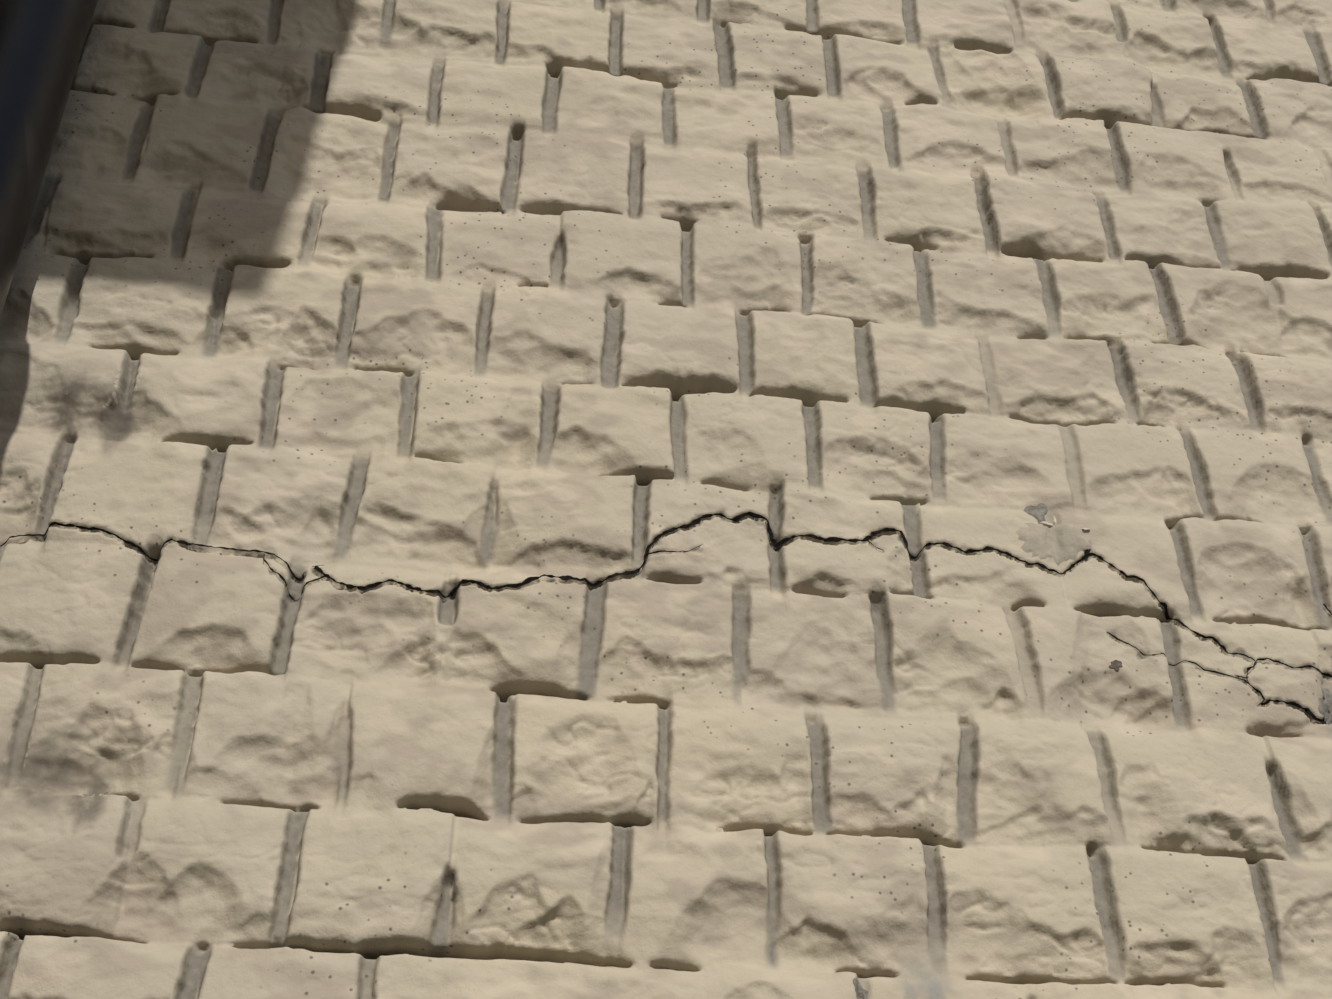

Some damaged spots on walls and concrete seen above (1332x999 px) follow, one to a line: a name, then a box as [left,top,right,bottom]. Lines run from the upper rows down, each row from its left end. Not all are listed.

crack [0,512,1332,723]